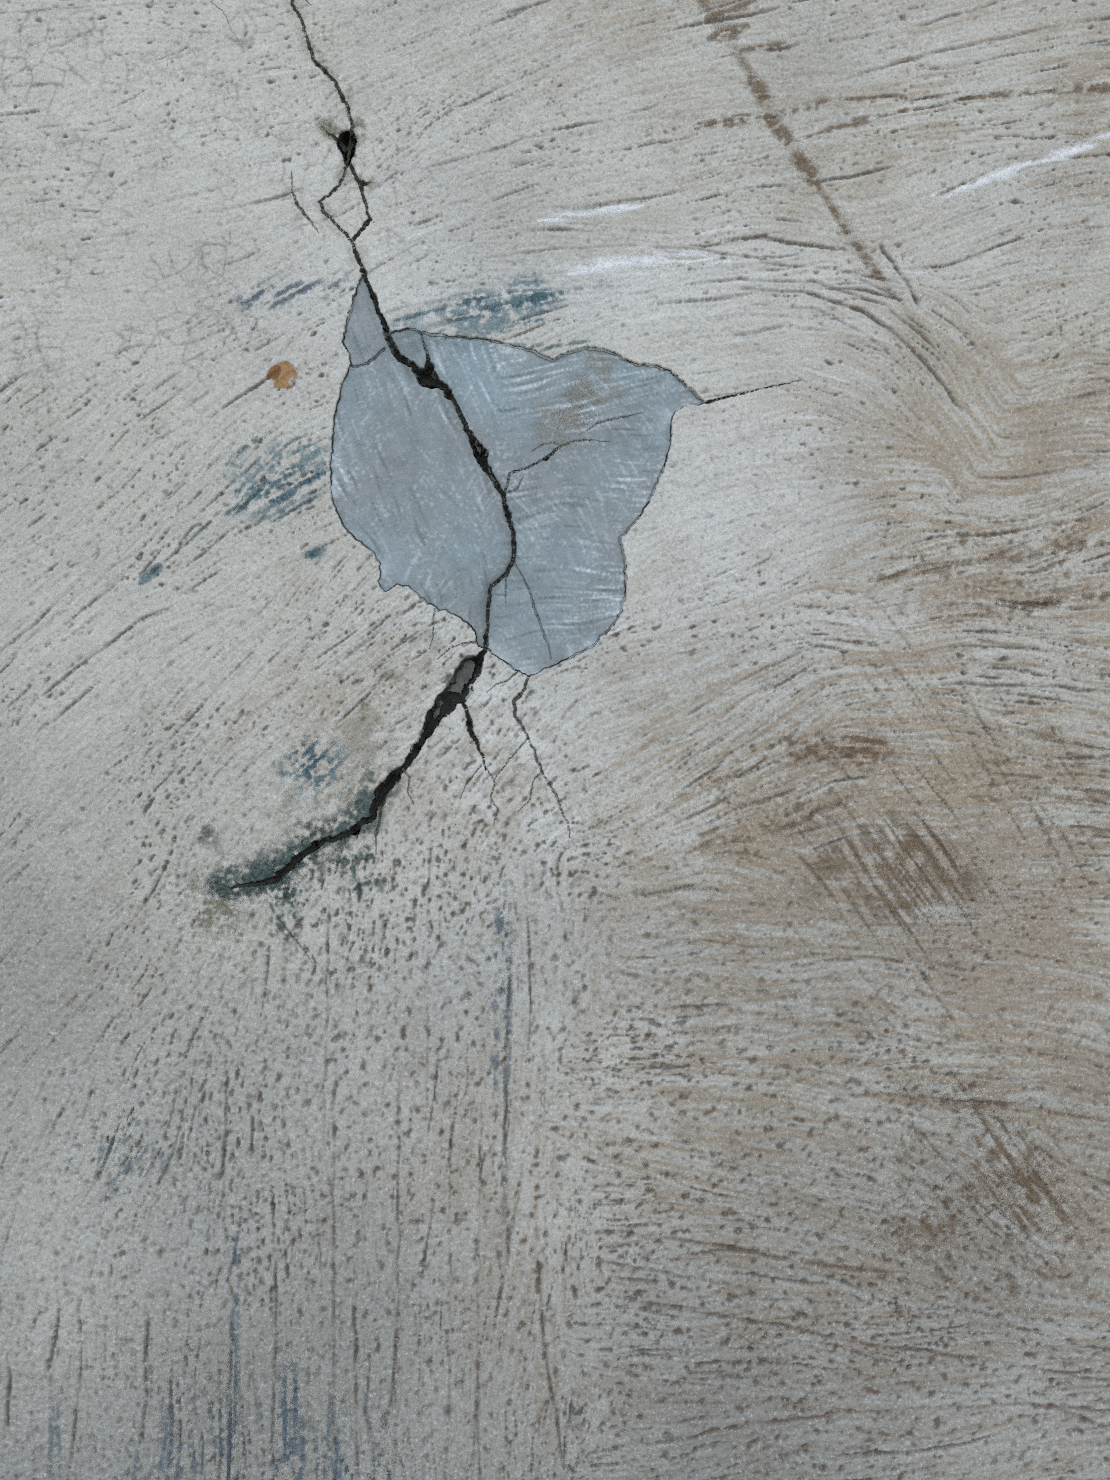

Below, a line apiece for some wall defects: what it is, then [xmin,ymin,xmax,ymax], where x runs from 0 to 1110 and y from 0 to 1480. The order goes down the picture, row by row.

corrosion [267,361,296,389]
crack [231,0,640,889]
peeling [329,274,708,677]